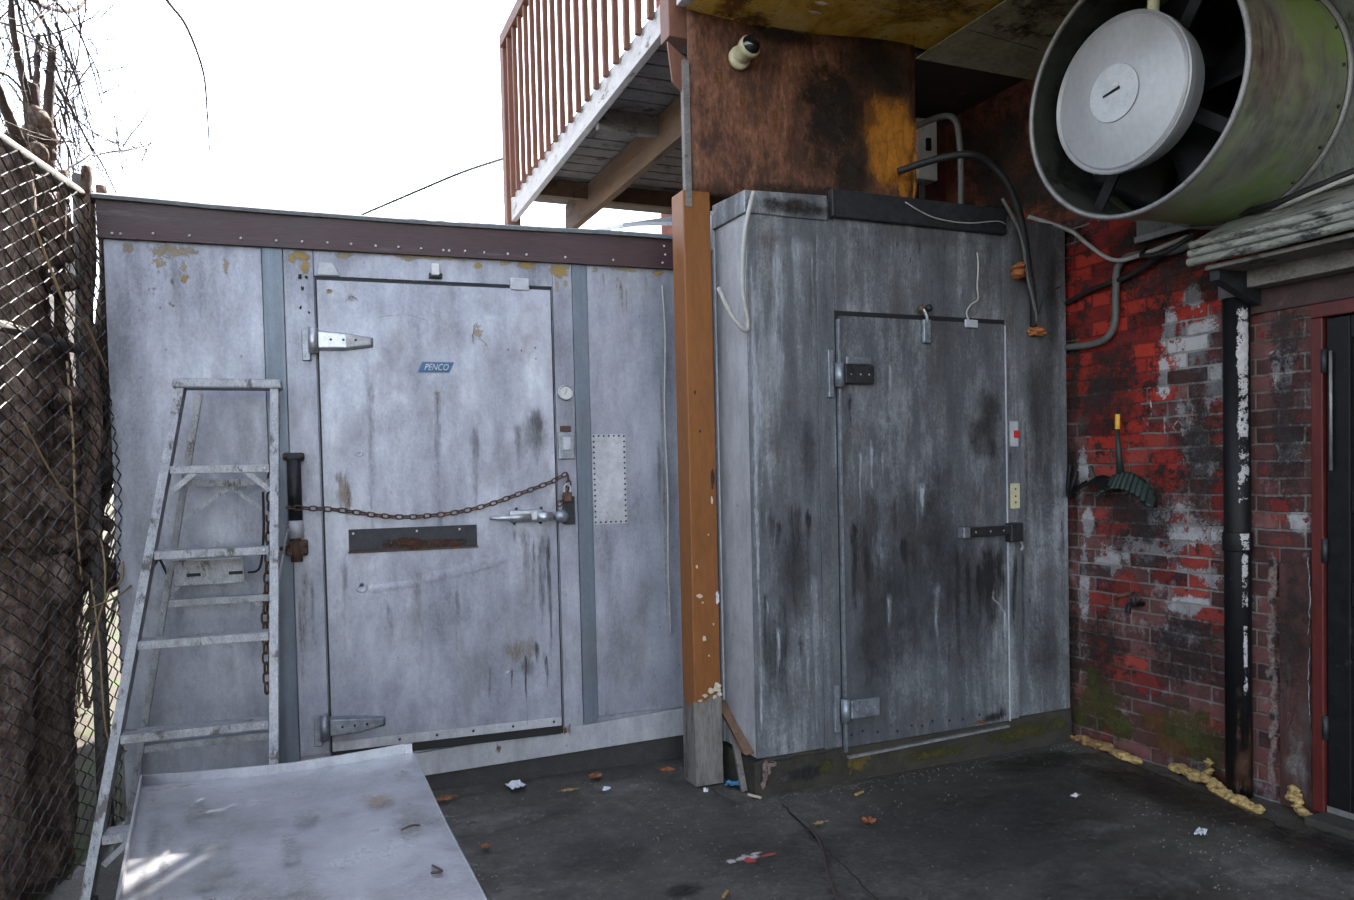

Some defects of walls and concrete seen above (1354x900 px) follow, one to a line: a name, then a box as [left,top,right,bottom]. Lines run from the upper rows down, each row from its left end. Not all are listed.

corrosion [862,96,917,198]
peeling [123,242,198,283]
peeling [1156,283,1250,503]
peeling [1269,335,1296,395]
corrosion [382,537,465,549]
water stain [851,523,879,599]
peeling [1240,533,1250,607]
peeling [1269,497,1312,537]
spalling [1265,553,1280,789]
crack [782,803,878,900]